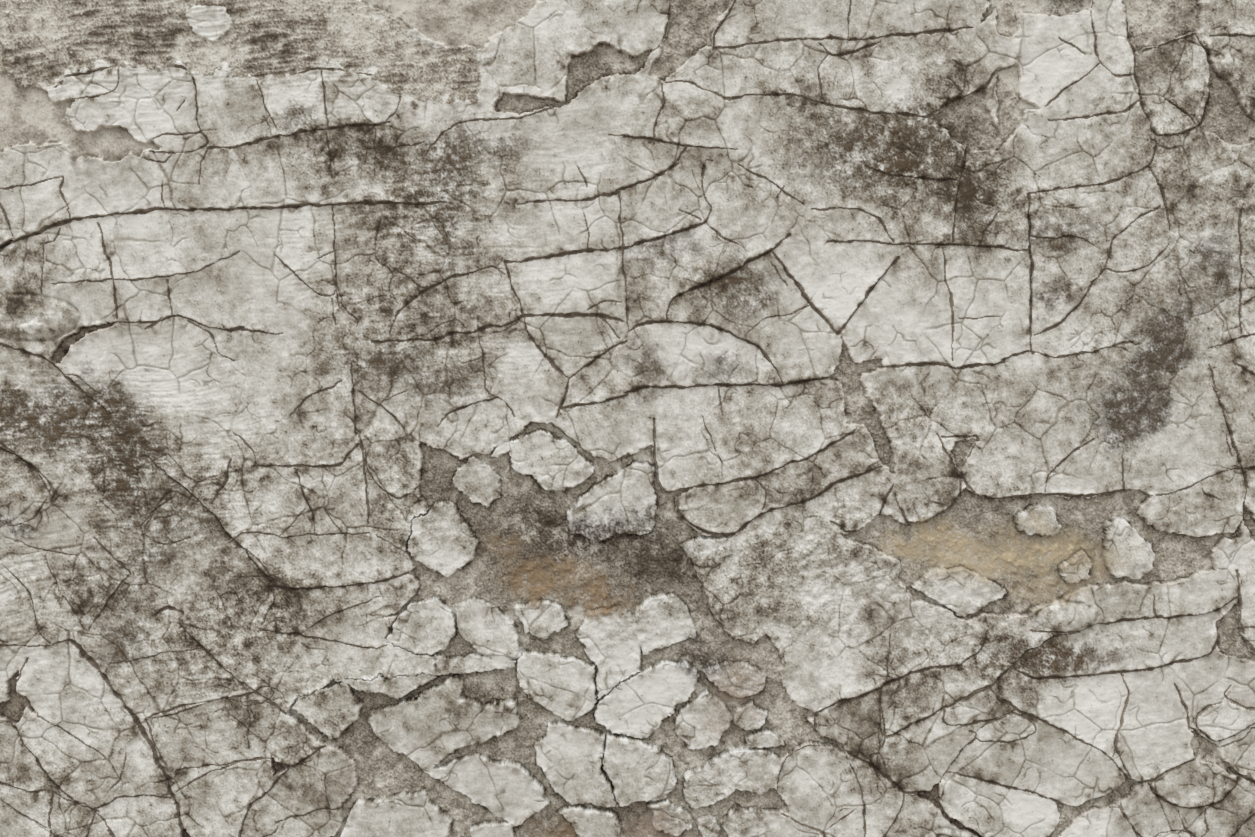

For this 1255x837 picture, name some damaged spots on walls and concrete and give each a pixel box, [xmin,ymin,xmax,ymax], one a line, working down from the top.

peeling [0,0,734,163]
crack [0,0,1255,650]
crack [0,441,341,837]
spalling [270,757,290,777]
spalling [286,419,849,837]
crack [777,569,1255,837]
spalling [837,437,1255,623]